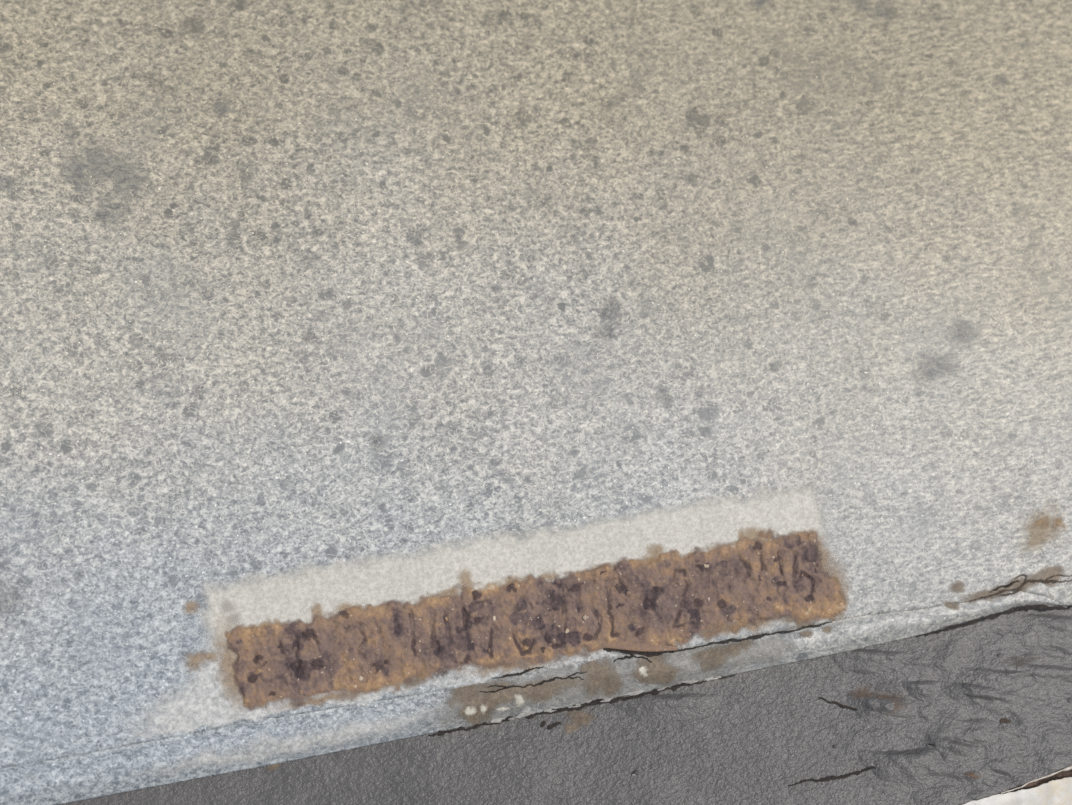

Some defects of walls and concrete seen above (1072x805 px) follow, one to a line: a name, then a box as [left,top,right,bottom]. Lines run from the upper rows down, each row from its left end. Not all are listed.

rust [190,528,846,724]
crack [924,574,1072,636]